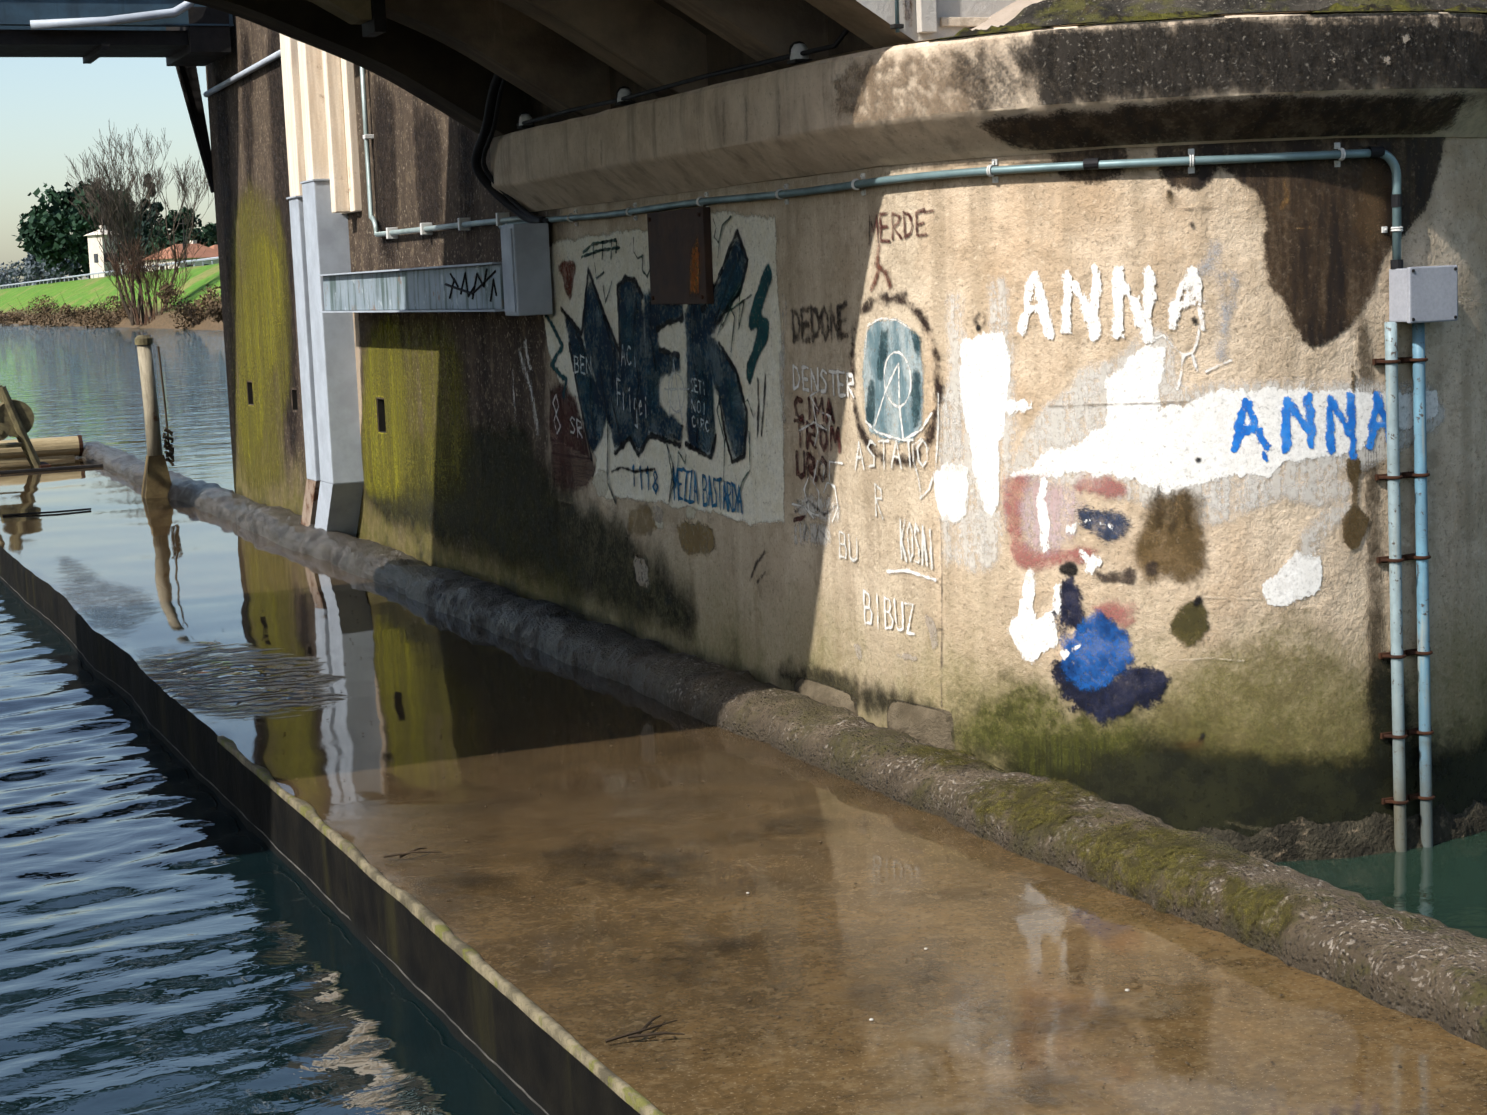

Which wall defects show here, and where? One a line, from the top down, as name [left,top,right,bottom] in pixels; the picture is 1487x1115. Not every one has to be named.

water stain [215,30,297,493]
water stain [361,315,470,498]
water stain [513,340,538,431]
water stain [834,43,1474,393]
water stain [1008,451,1487,837]